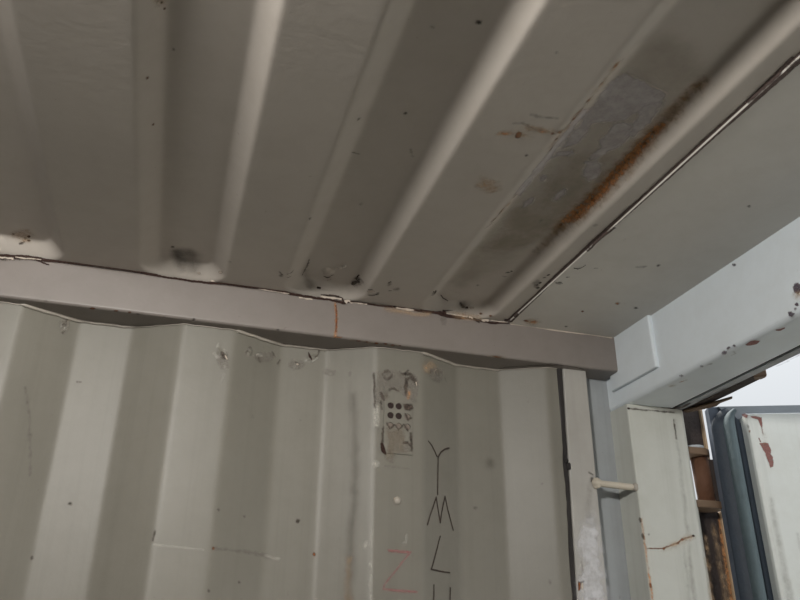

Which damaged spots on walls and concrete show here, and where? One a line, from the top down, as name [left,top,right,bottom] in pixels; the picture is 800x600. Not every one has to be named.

rust [560,123,665,225]